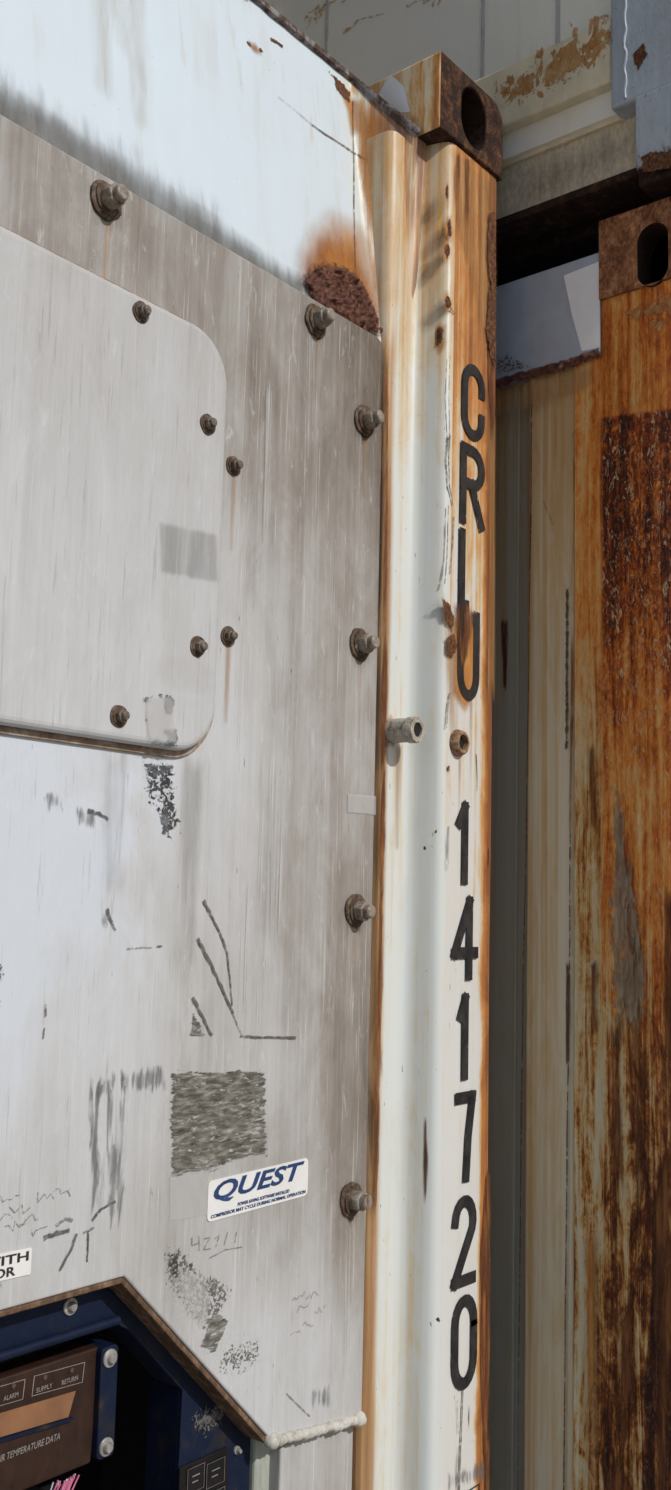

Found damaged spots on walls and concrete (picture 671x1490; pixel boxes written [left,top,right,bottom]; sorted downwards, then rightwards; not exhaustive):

corrosion [364,116,377,272]
corrosion [442,596,508,706]
corrosion [563,589,595,1490]
corrosion [610,893,671,1490]
corrosion [604,1305,636,1490]